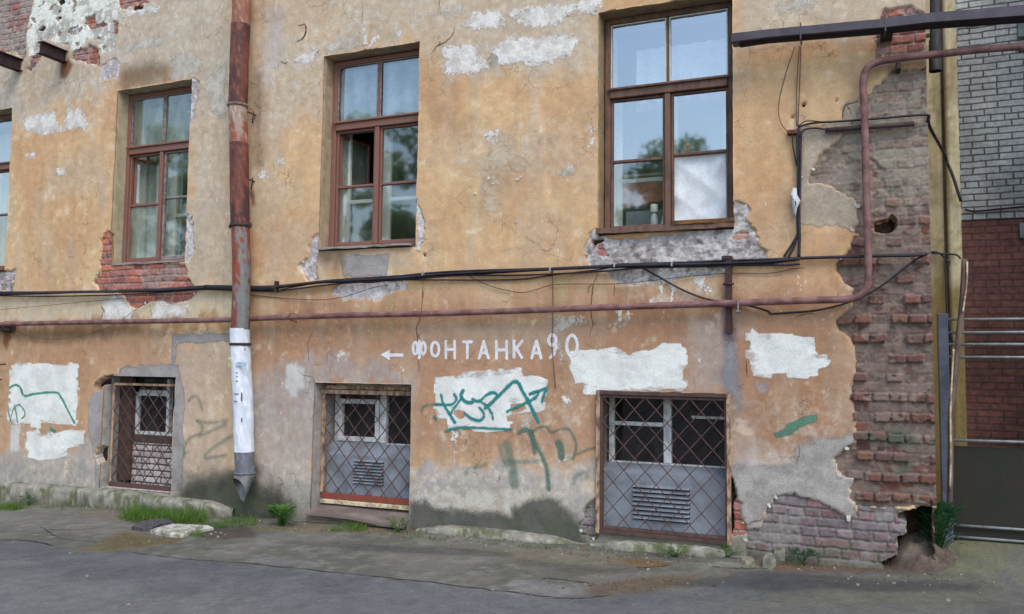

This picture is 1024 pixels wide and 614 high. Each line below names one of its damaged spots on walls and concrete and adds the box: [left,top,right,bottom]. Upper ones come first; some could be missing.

flaking render [0,0,161,81]
peeling [435,0,603,78]
flaking render [880,6,920,19]
flaking render [874,30,926,59]
flaking render [95,214,197,319]
spalling [584,201,767,286]
flaking render [732,68,937,569]
damp [410,499,583,542]